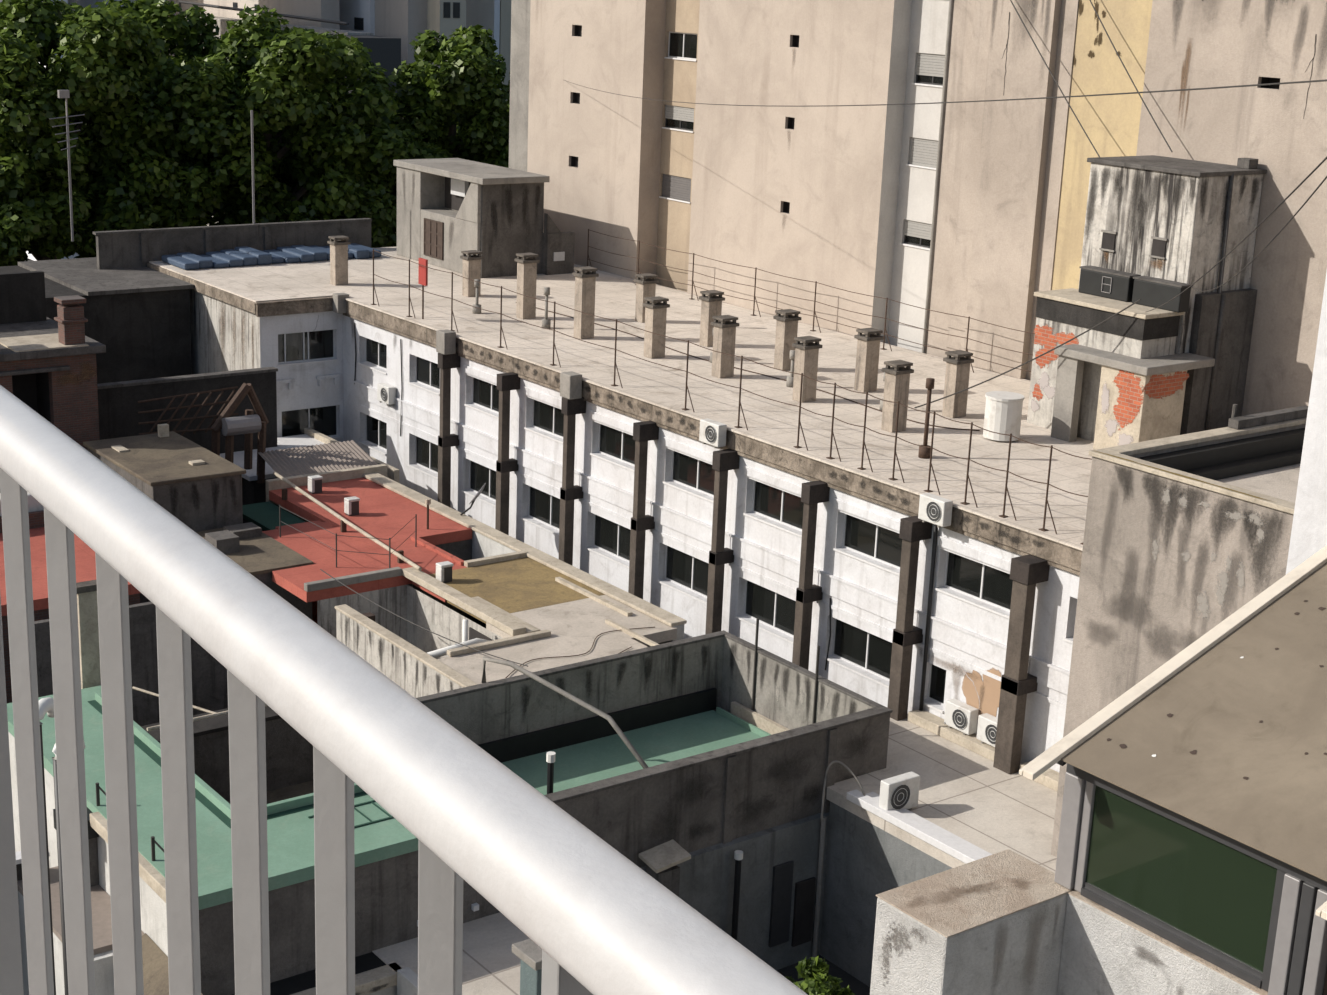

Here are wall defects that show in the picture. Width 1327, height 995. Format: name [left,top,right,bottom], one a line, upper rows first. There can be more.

water stain [1086,169,1207,242]
water stain [1223,178,1258,223]
flaking render [1032,324,1079,368]
flaking render [1032,384,1043,401]
flaking render [1101,370,1189,446]
water stain [1118,468,1204,568]
water stain [1214,499,1281,578]
water stain [730,646,855,716]
water stain [880,922,926,985]